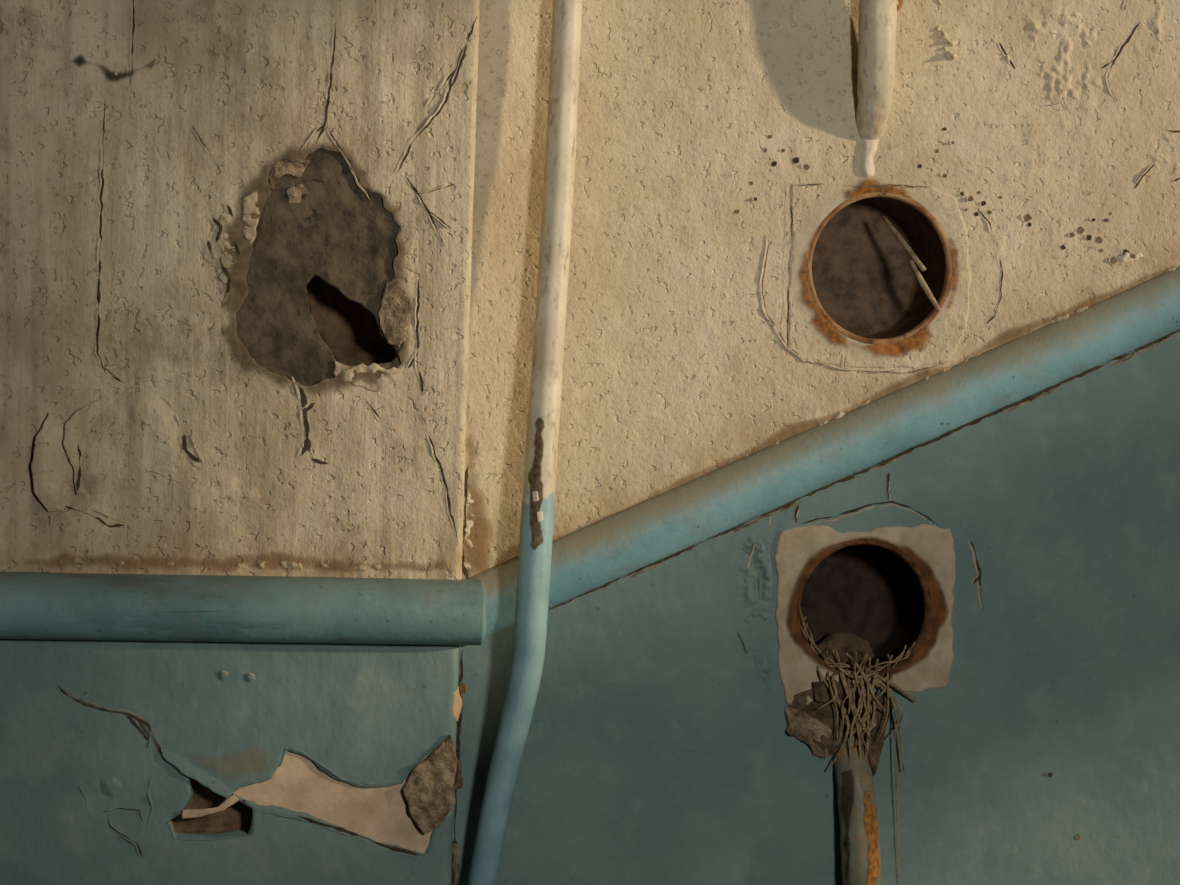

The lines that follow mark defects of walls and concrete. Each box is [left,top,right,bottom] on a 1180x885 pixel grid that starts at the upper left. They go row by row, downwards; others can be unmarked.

crack [299,23,373,200]
crack [392,17,477,247]
corrosion [847,180,909,198]
flaking render [207,146,413,392]
corrosion [800,237,847,345]
corrosion [868,325,930,356]
corrosion [948,240,958,307]
corrosion [787,538,948,674]
peeling [452,687,462,721]
peeling [161,735,457,859]
corrosion [864,791,879,885]